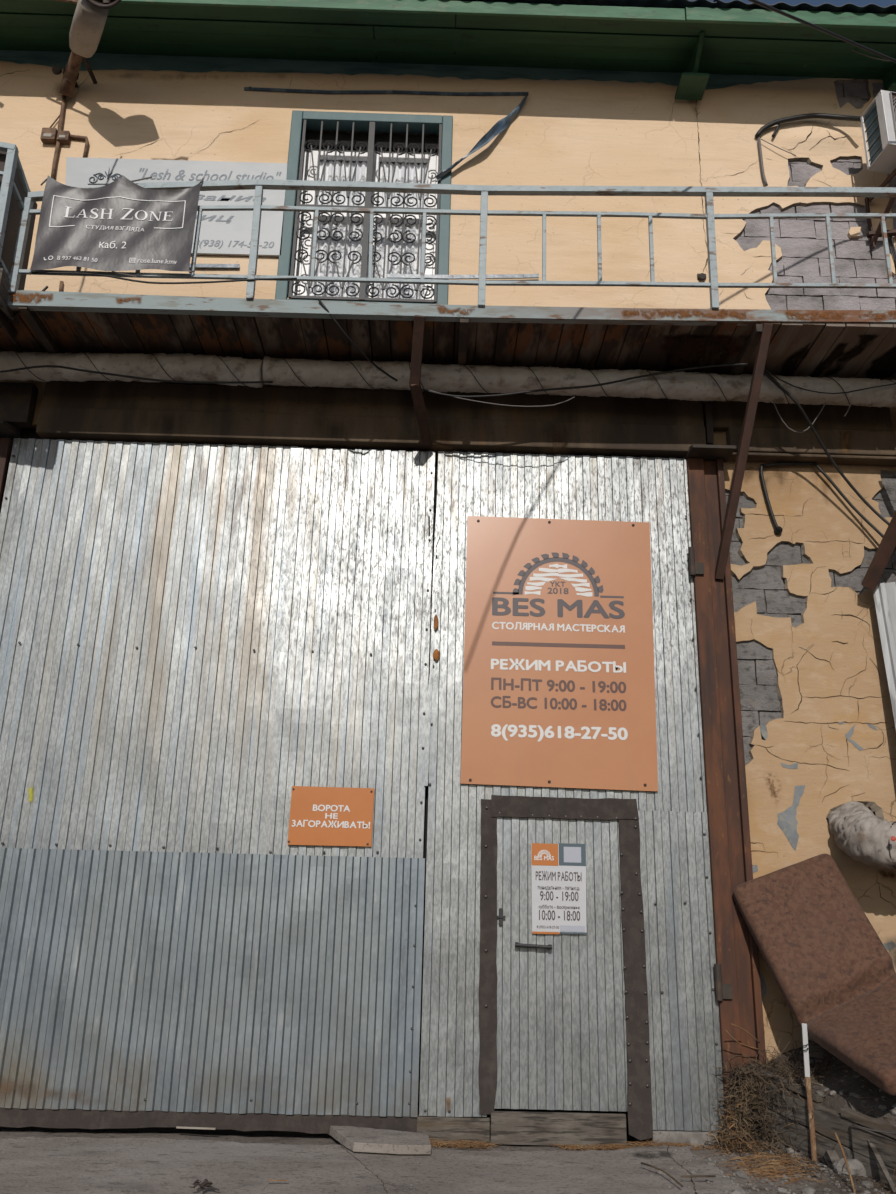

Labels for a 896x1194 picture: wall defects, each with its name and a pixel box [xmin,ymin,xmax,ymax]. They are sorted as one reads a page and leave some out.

flaking render [833,79,884,109]
crack [670,89,771,299]
flaking render [787,156,863,187]
flaking render [733,173,896,310]
corrosion [622,309,746,319]
flaking render [872,470,896,517]
flaking render [725,489,813,628]
flaking render [828,546,896,594]
crack [751,519,887,802]
flaking render [736,639,784,766]
peeling [777,785,805,850]
hole [857,801,884,820]